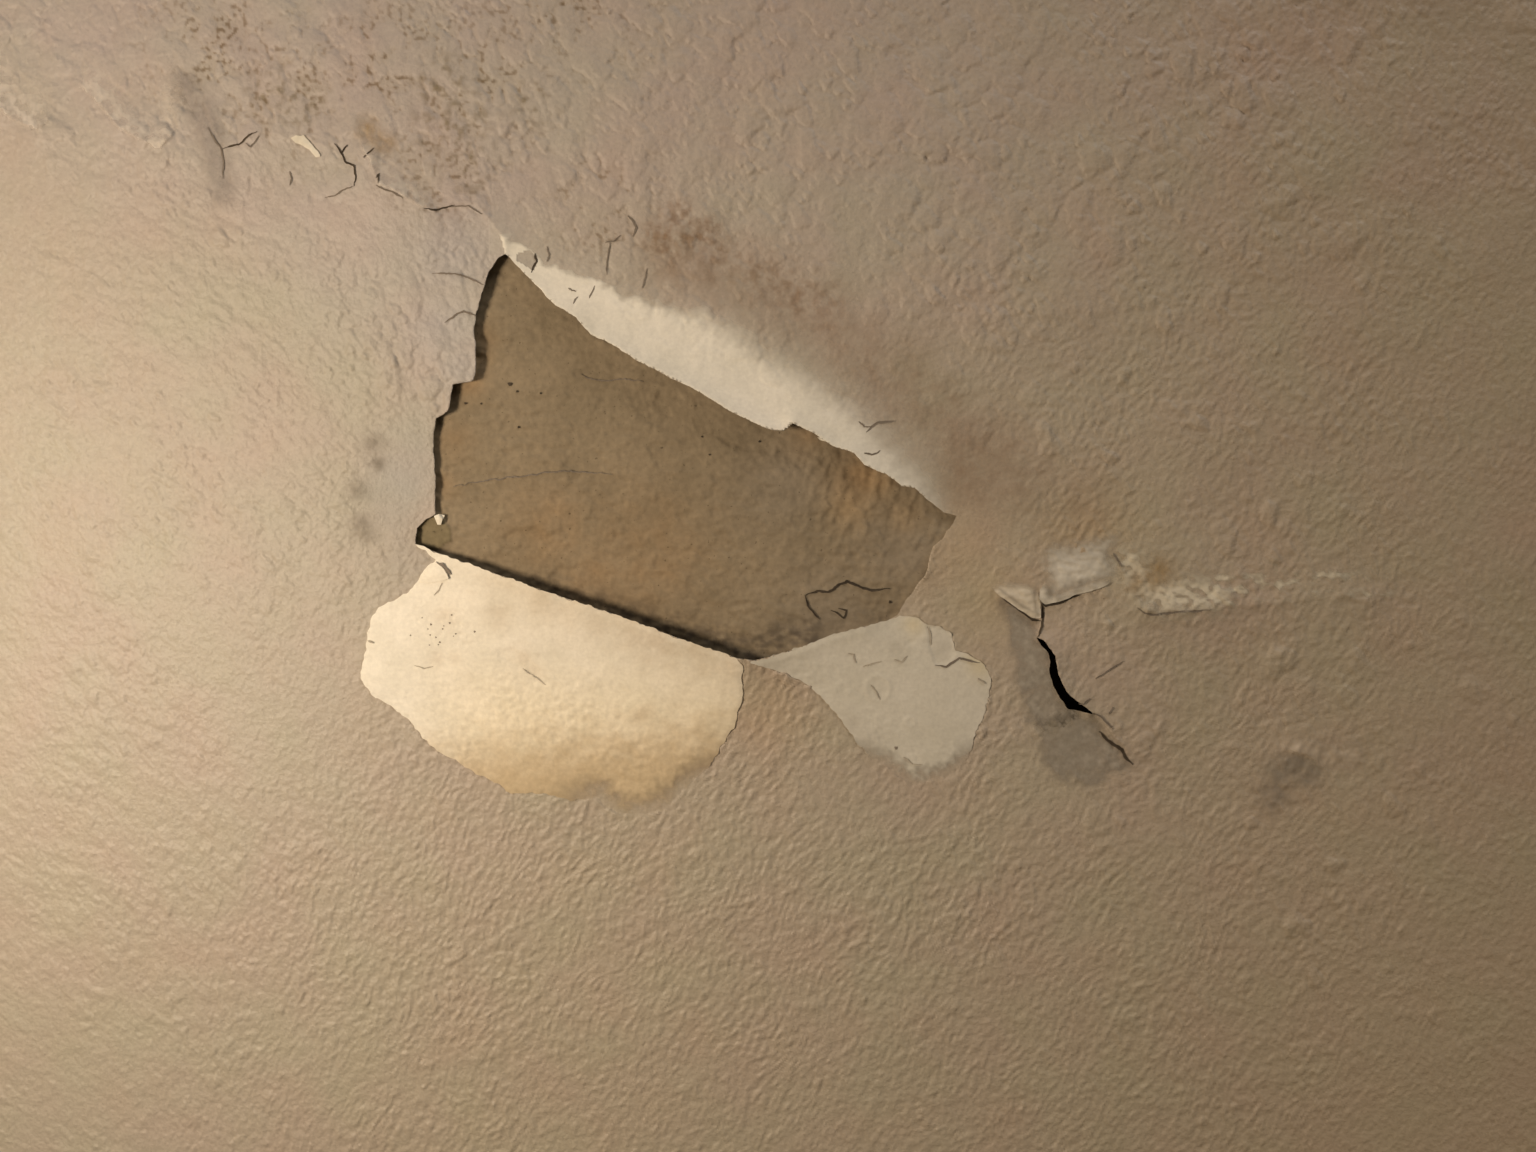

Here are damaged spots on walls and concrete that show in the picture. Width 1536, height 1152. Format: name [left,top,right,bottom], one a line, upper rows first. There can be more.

peeling [291,135,320,157]
peeling [361,254,991,802]
crack [1037,602,1184,779]
peeling [995,528,1409,784]